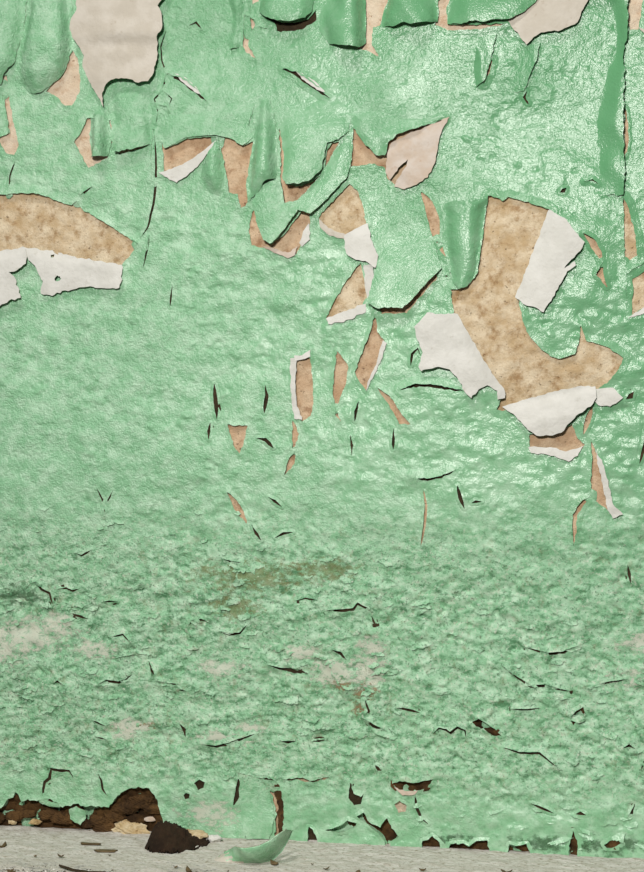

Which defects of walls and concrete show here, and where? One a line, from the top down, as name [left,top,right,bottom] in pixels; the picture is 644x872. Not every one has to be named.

peeling [0,0,644,551]
crack [22,576,191,696]
crack [263,644,353,679]
crack [496,640,633,716]
crack [357,696,472,743]
crack [38,763,111,807]
spalling [0,781,169,834]
peeling [81,842,118,853]
crack [175,719,330,809]
spalling [419,833,493,851]
spalling [504,841,534,853]
peeling [548,802,644,856]